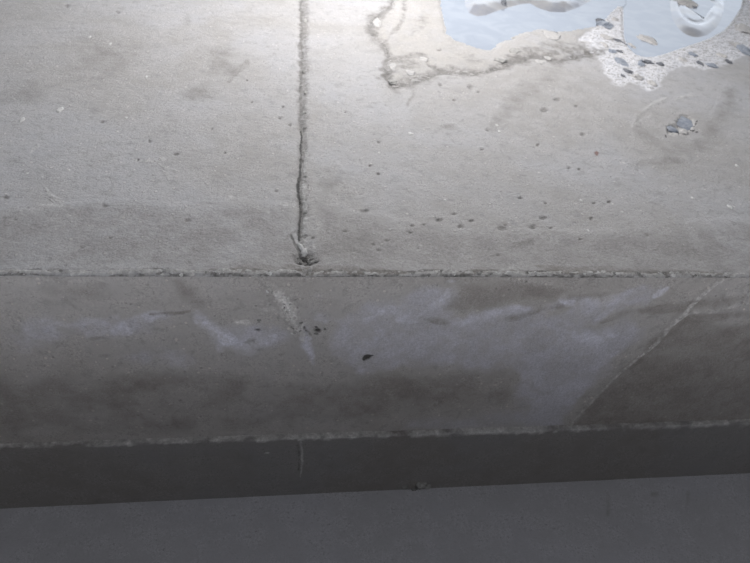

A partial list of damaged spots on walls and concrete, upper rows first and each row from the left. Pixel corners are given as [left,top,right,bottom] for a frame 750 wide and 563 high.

peeling [360,0,750,119]
crack [0,0,749,278]
spalling [662,114,700,137]